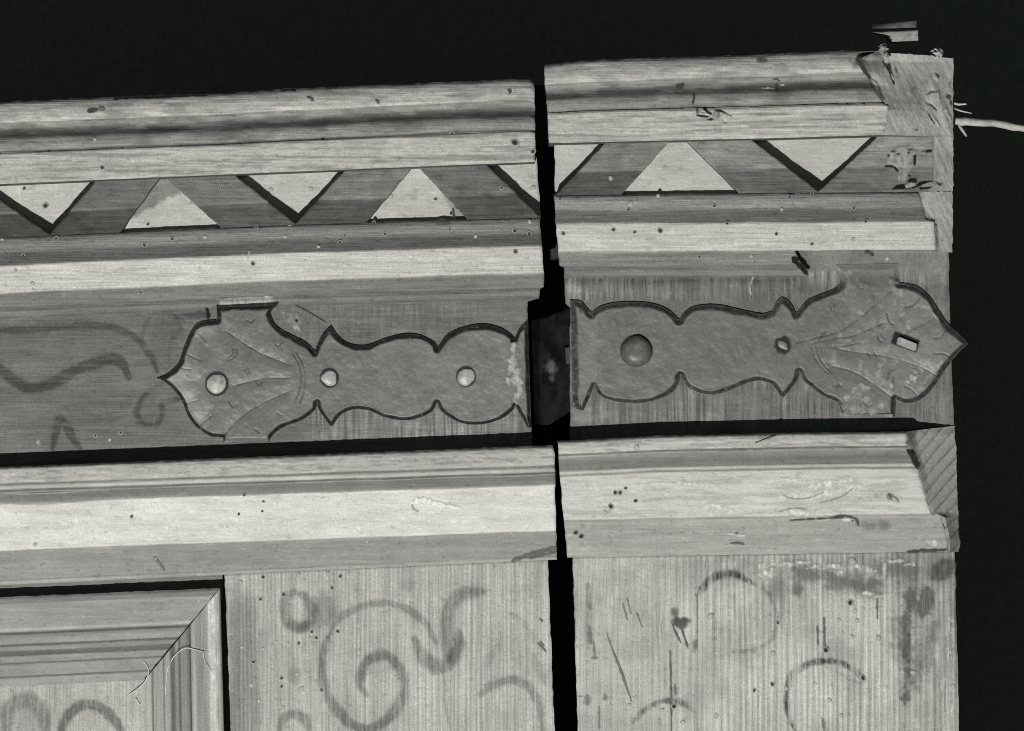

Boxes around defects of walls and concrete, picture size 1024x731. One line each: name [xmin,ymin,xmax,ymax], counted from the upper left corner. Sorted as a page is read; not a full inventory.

peeling [926,76,952,128]
damp [793,569,814,595]
damp [831,576,880,619]
damp [903,560,955,677]